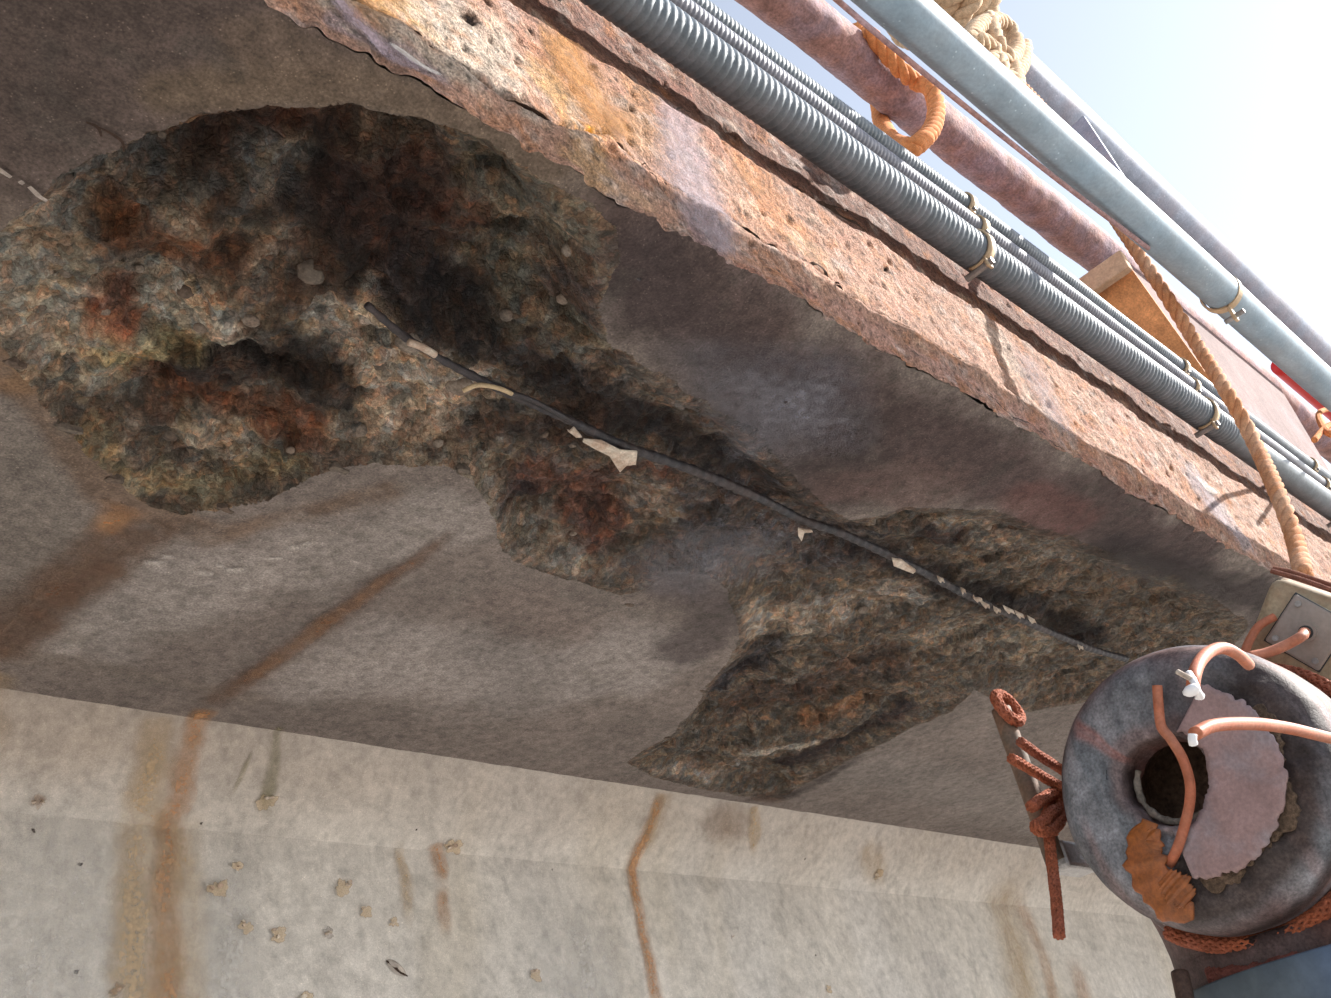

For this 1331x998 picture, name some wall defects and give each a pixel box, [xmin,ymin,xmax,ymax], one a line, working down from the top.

spalling [0,101,1249,797]
rust [628,802,660,994]